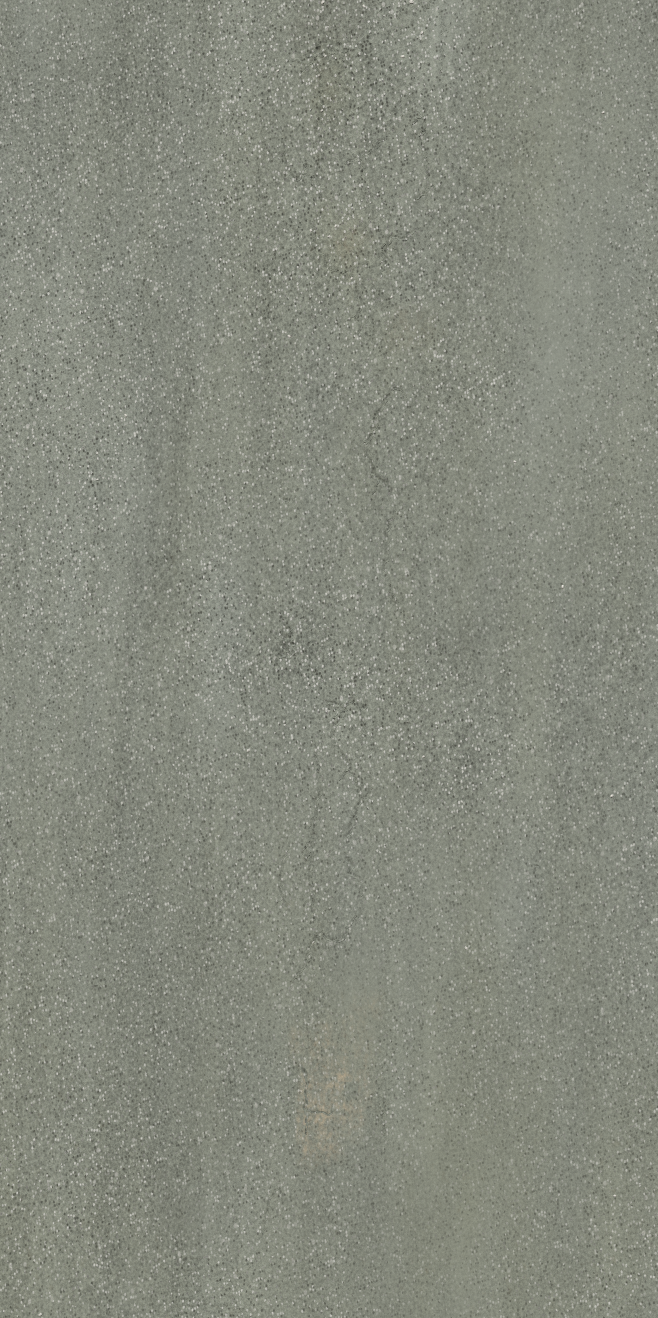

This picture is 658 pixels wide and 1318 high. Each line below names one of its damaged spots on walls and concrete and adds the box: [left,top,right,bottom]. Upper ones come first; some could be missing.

crack [300,57,324,128]
crack [312,104,439,337]
crack [362,387,406,612]
crack [275,695,373,988]